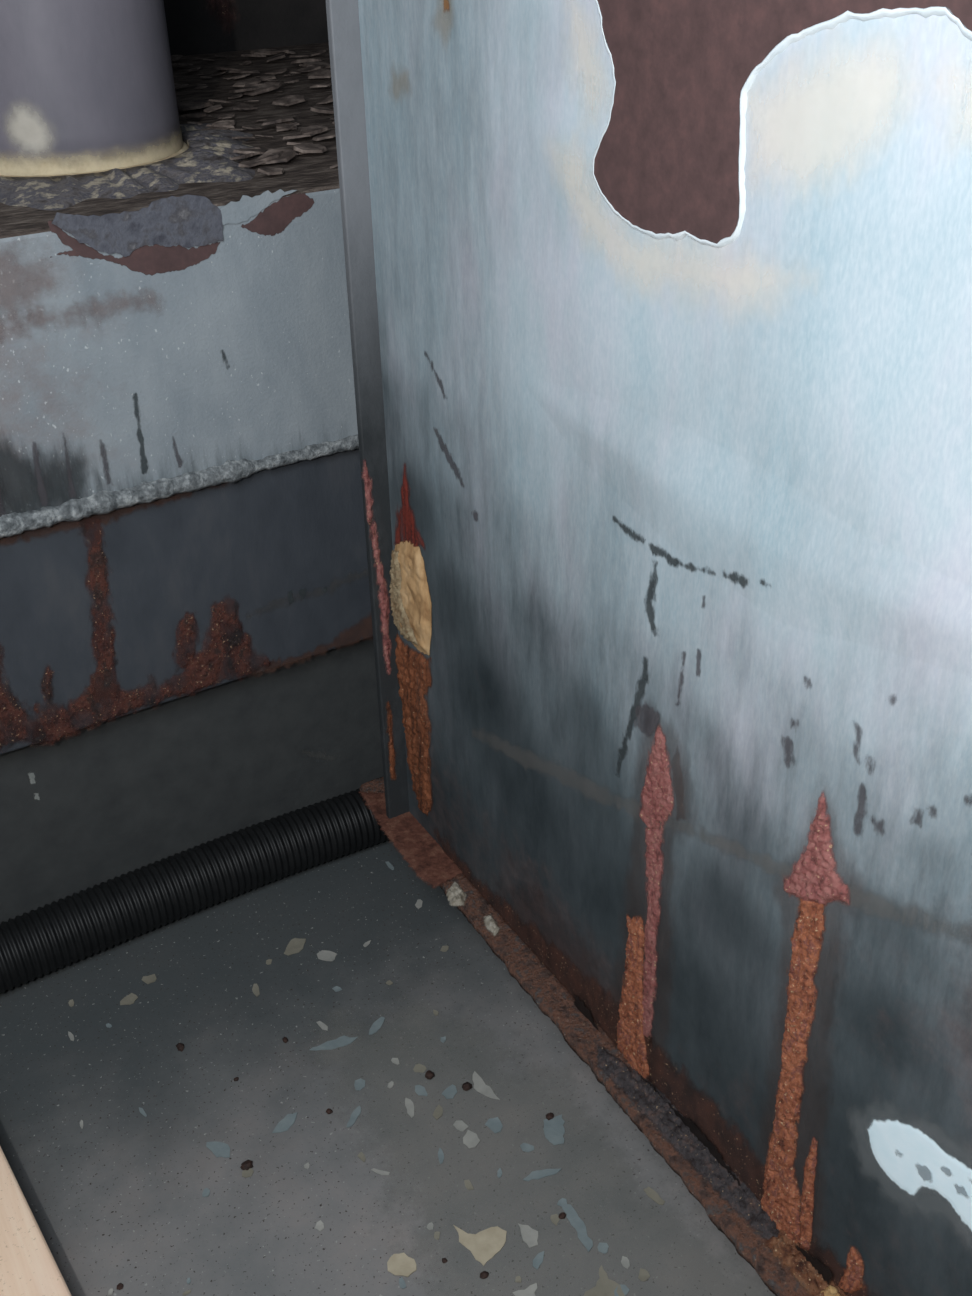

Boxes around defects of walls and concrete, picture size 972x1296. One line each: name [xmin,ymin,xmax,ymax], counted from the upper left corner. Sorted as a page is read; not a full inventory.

peeling [592,0,972,248]
peeling [48,189,314,275]
rust [0,461,432,815]
crack [617,562,658,774]
crack [677,650,701,704]
rust [616,704,674,1079]
rust [760,793,850,1250]
rust [838,1247,864,1294]
peeling [855,1108,972,1242]